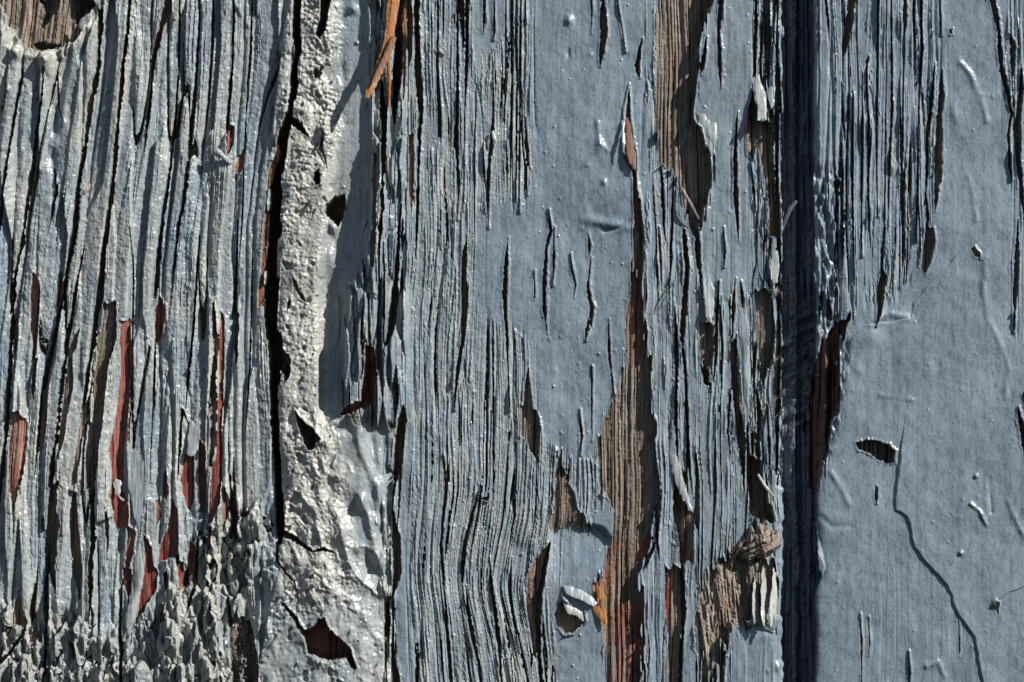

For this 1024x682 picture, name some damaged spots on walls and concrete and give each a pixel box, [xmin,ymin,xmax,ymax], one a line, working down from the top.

peeling [78,0,103,30]
peeling [655,0,718,240]
peeling [187,420,201,456]
peeling [555,84,657,682]
peeling [808,313,850,488]
peeling [113,448,150,632]
peeling [526,450,592,682]
peeling [698,551,778,632]
peeling [816,509,826,577]